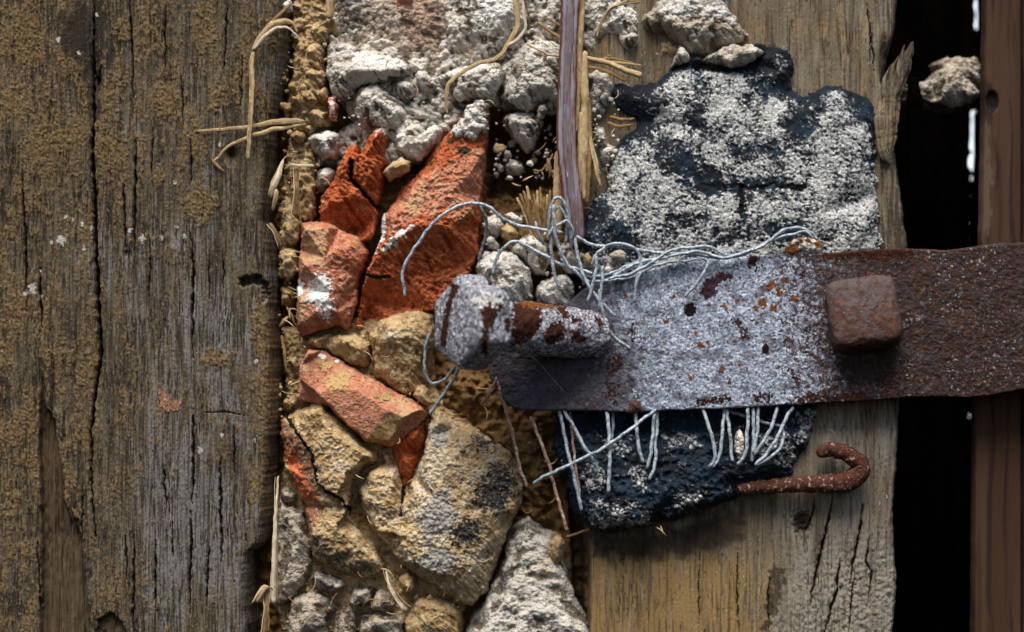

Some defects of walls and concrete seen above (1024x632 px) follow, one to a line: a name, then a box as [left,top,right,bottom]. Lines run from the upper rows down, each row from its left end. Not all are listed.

crack [81,0,154,539]
rust [817,248,913,263]
rust [479,301,604,355]
rust [696,366,732,407]
rust [752,390,774,405]
rust [787,368,873,404]
crack [805,498,872,632]